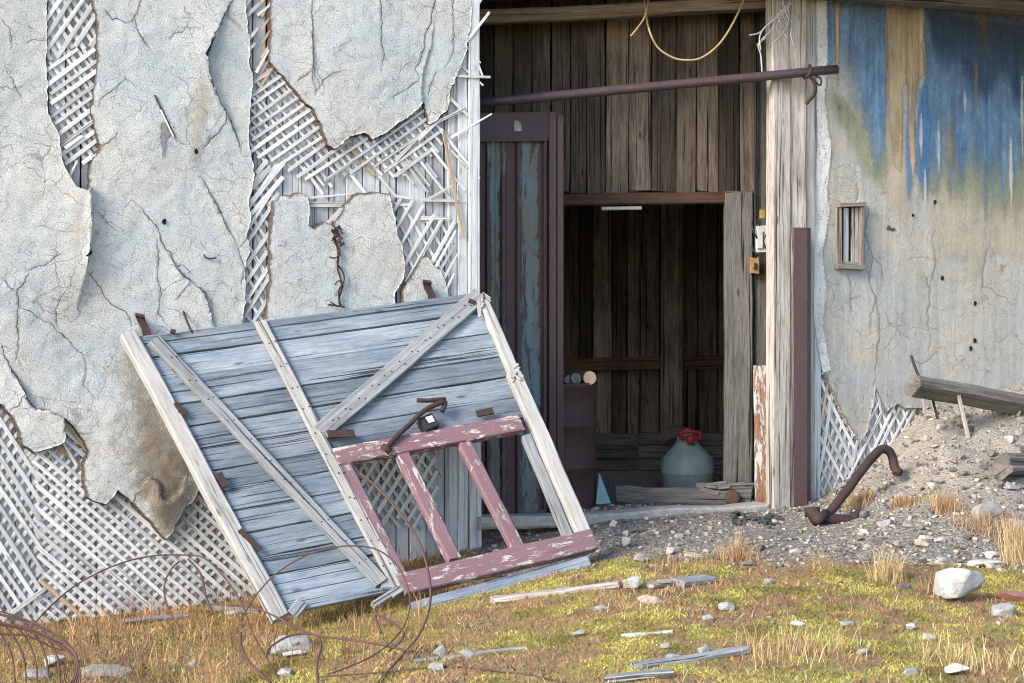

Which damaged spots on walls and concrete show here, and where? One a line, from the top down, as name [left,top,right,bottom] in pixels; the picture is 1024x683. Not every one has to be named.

crack [2,253,133,417]
spalling [46,0,100,190]
crack [130,200,213,326]
crack [208,0,241,148]
crack [201,177,249,284]
spalling [242,0,492,323]
spalling [814,0,925,498]
damp [825,2,1024,266]
crack [916,203,996,375]
spalling [0,404,255,677]
crack [131,472,189,506]
spalling [660,559,870,645]